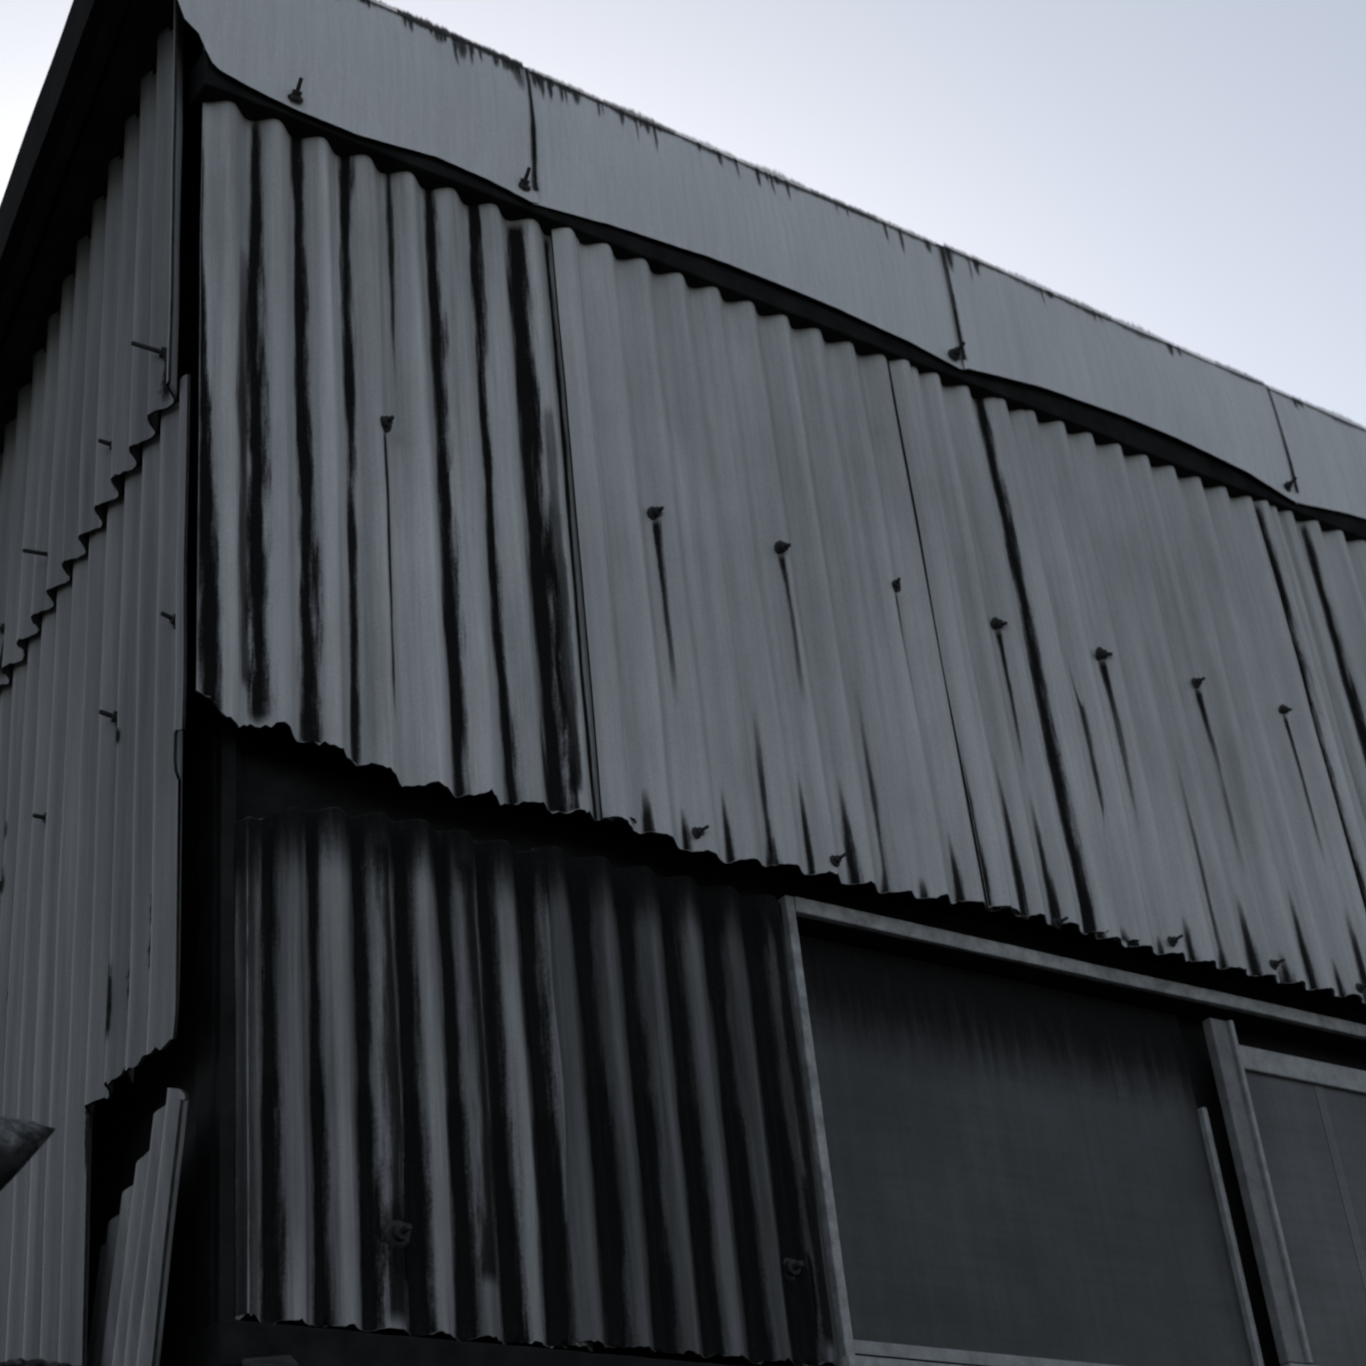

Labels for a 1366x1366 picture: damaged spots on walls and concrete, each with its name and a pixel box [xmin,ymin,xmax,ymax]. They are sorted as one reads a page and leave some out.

corrosion [198,149,222,708]
corrosion [238,121,271,720]
corrosion [290,136,322,743]
corrosion [339,155,360,765]
corrosion [425,189,467,797]
corrosion [468,204,518,804]
corrosion [507,226,603,820]
corrosion [361,0,1366,493]
corrosion [975,398,1140,947]
corrosion [1254,507,1366,911]
corrosion [351,842,437,1337]
corrosion [435,851,530,1344]